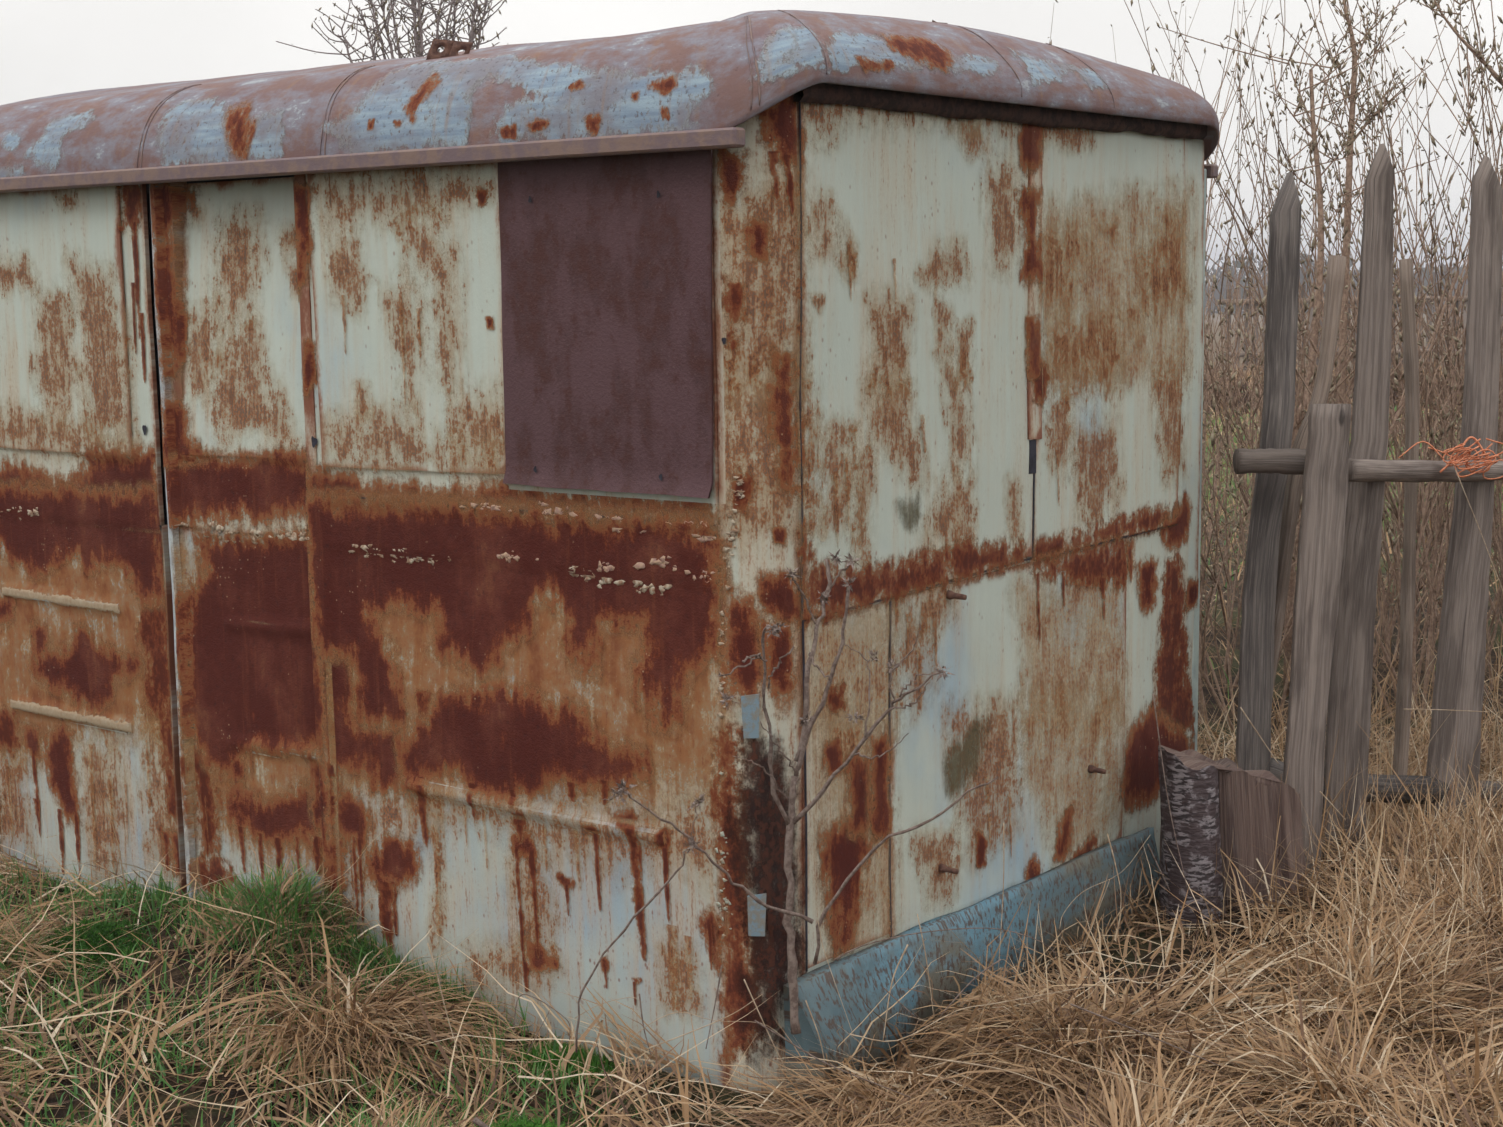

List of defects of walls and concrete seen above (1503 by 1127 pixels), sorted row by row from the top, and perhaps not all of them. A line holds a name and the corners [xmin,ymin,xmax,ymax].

corrosion [854,34,954,73]
corrosion [393,72,441,127]
corrosion [568,79,584,91]
corrosion [631,75,678,121]
peeling [348,544,451,568]
peeling [496,550,539,563]
corrosion [0,91,1199,1065]